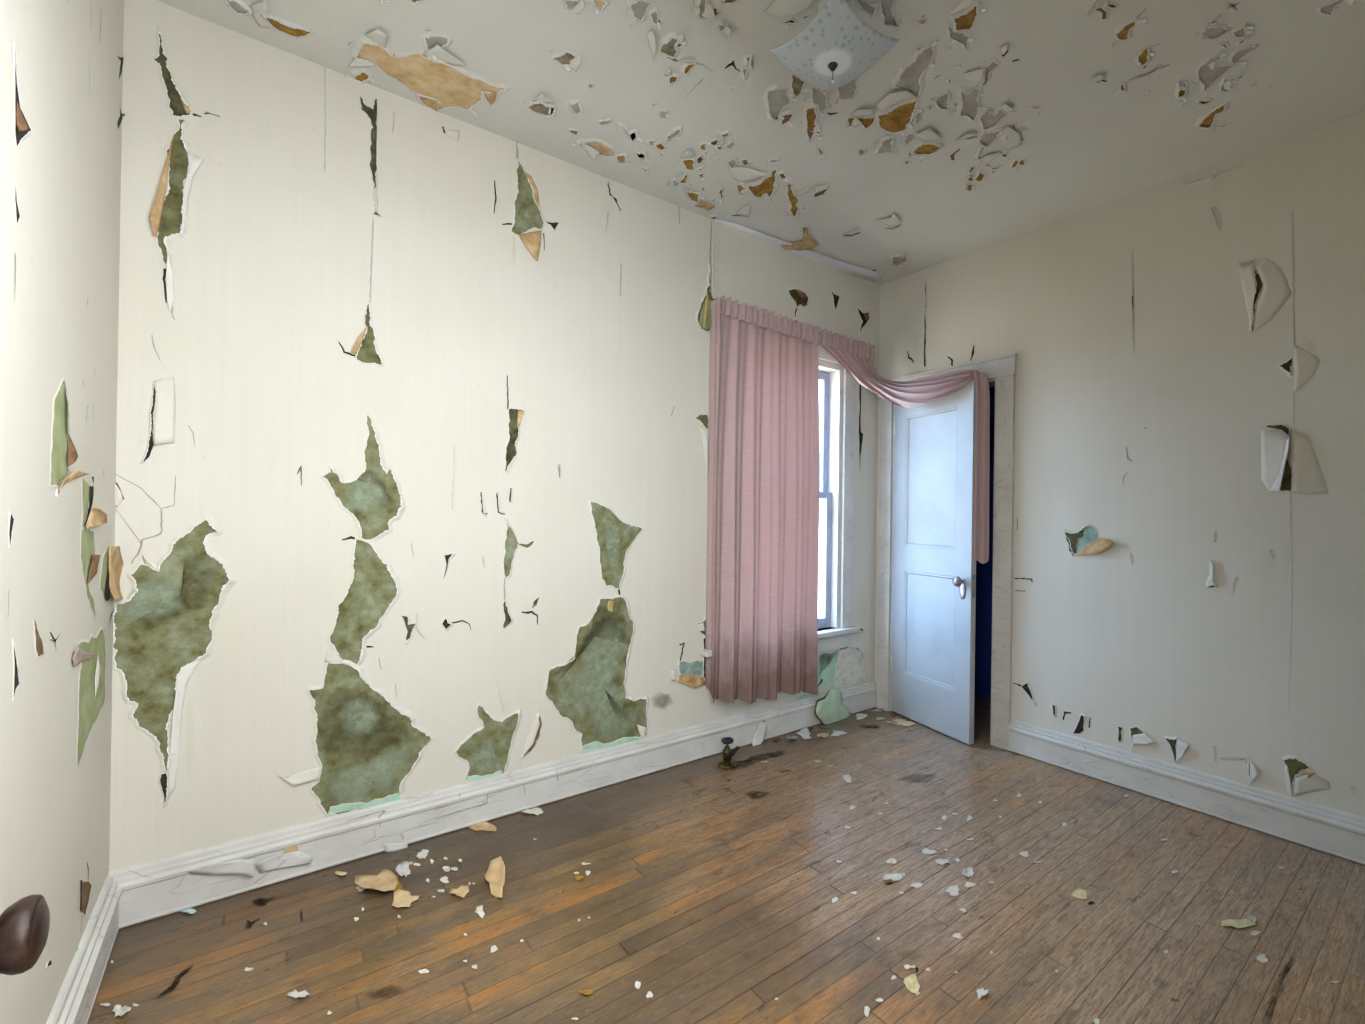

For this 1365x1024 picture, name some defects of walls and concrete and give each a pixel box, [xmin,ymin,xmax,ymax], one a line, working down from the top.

peeling [345,29,511,118]
peeling [763,0,1028,192]
peeling [1087,0,1169,94]
peeling [1174,3,1260,129]